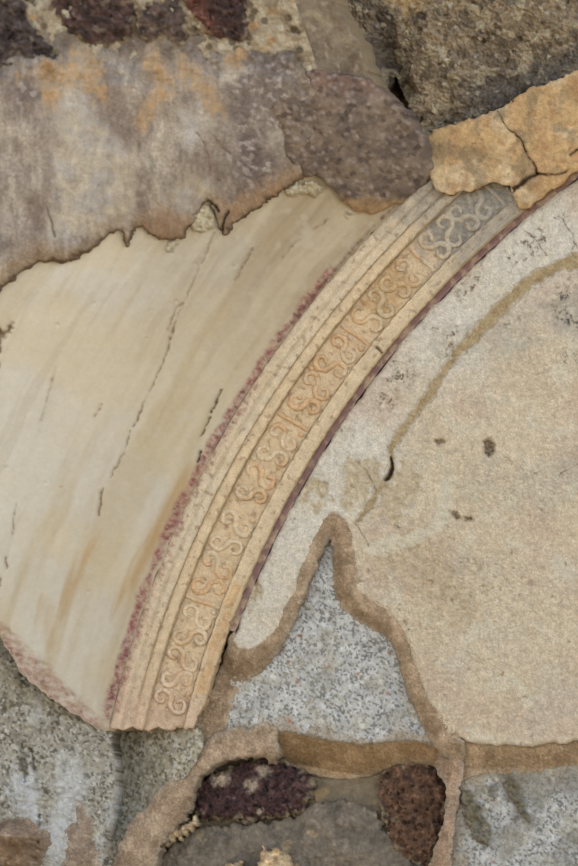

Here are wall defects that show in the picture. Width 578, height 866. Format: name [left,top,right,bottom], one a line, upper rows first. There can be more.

crack [495,109,578,194]
crack [354,213,578,547]